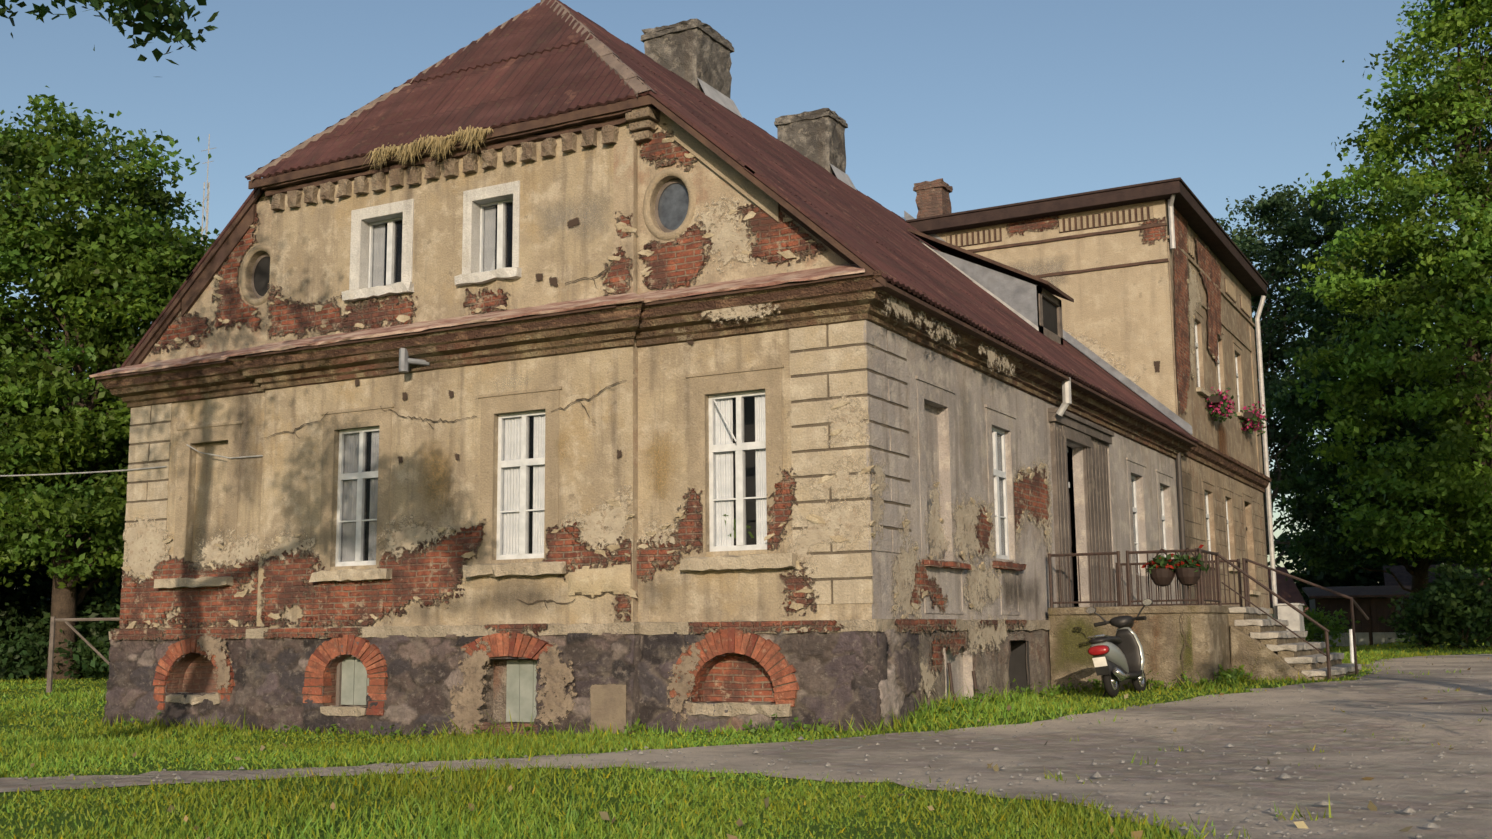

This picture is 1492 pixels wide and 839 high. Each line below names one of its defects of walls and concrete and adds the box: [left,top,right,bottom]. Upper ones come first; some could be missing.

flaking render [149,212,418,356]
flaking render [463,287,510,315]
flaking render [600,195,827,296]
peeling [701,302,780,324]
peeling [883,295,960,344]
peeling [978,342,1015,375]
flaking render [1063,206,1222,416]
flaking render [110,513,486,693]
flaking render [542,485,703,623]
peeling [667,391,889,722]
peeling [891,475,1027,699]
flaking render [1014,459,1053,557]